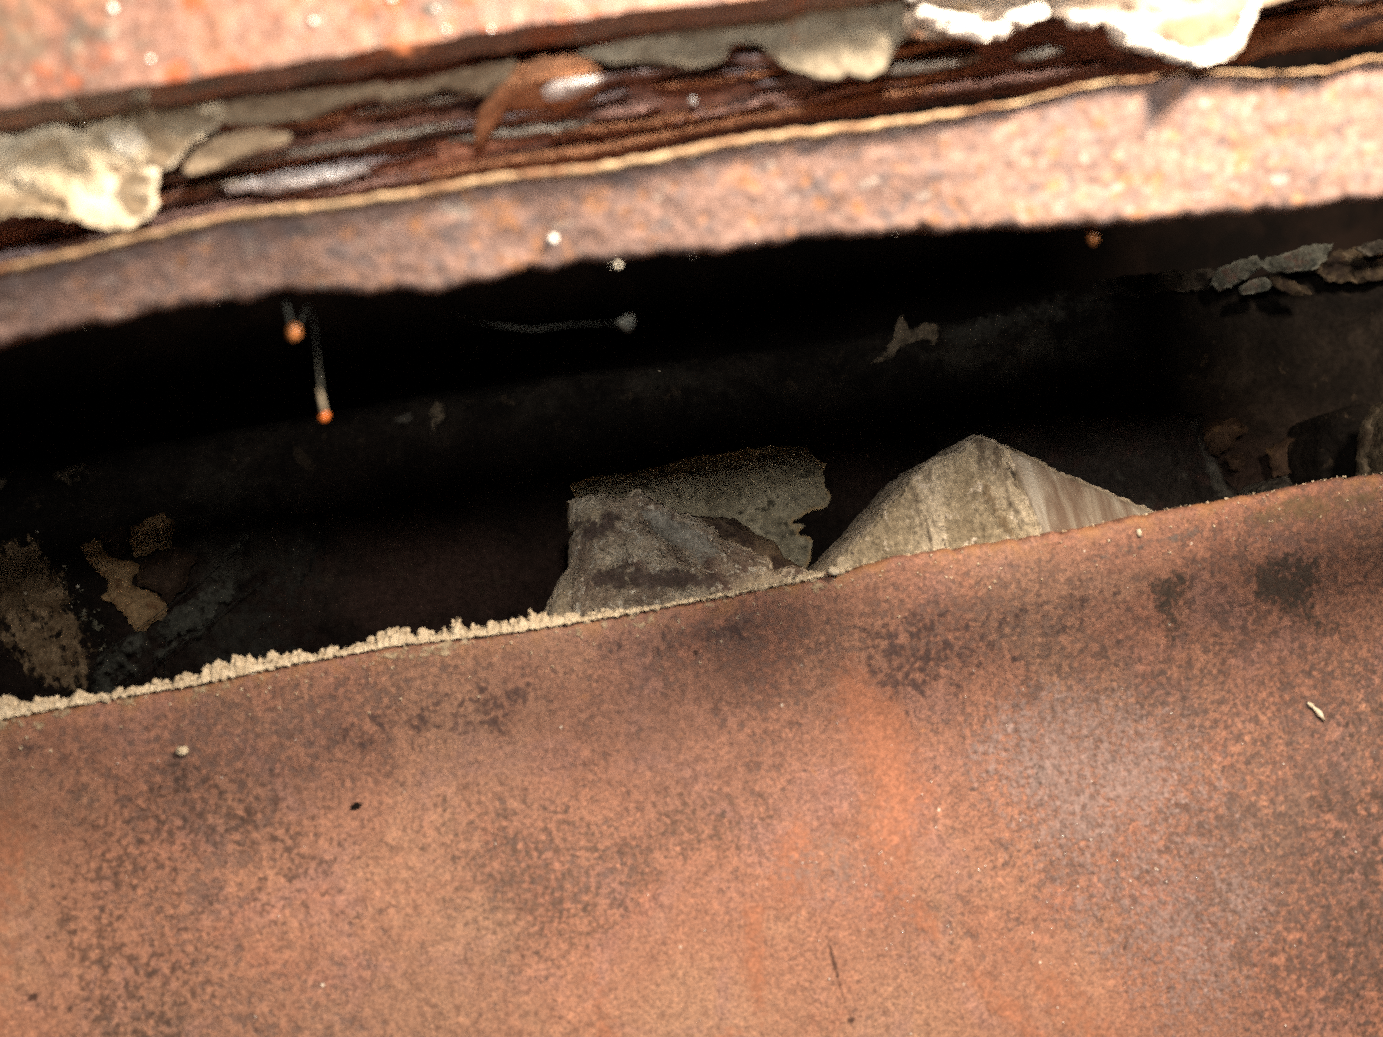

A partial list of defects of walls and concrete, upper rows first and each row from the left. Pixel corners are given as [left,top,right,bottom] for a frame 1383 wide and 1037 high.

peeling [576,0,1285,80]
peeling [0,60,526,230]
rust [0,0,1383,266]
peeling [874,316,939,362]